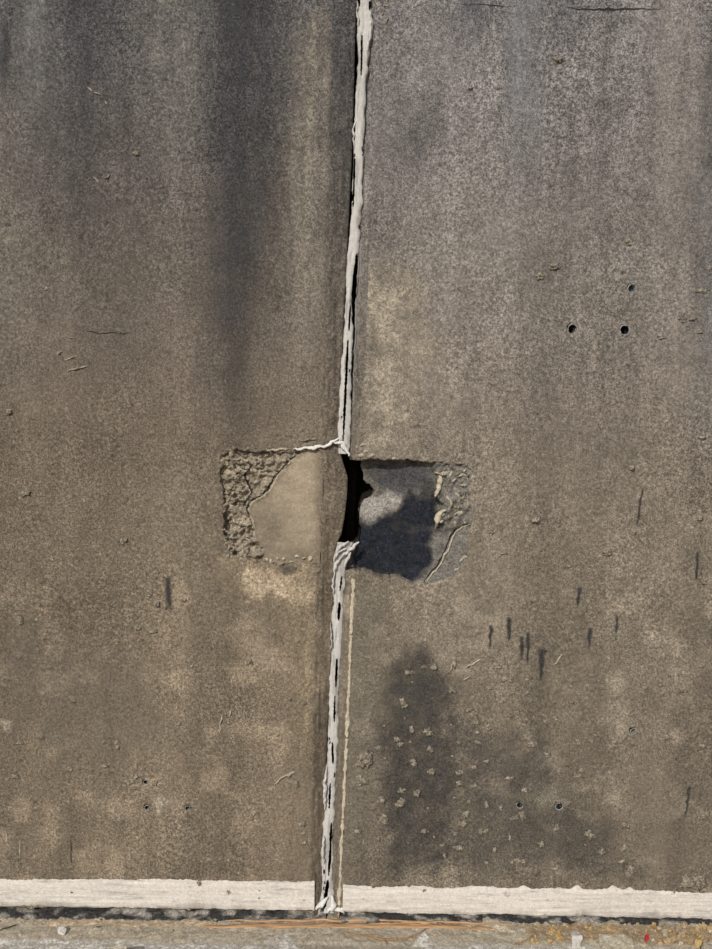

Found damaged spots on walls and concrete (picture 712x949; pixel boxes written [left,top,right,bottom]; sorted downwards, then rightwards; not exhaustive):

spalling [212,440,324,573]
spalling [341,443,475,589]
leakage [507,618,545,678]
leakage [385,653,456,864]